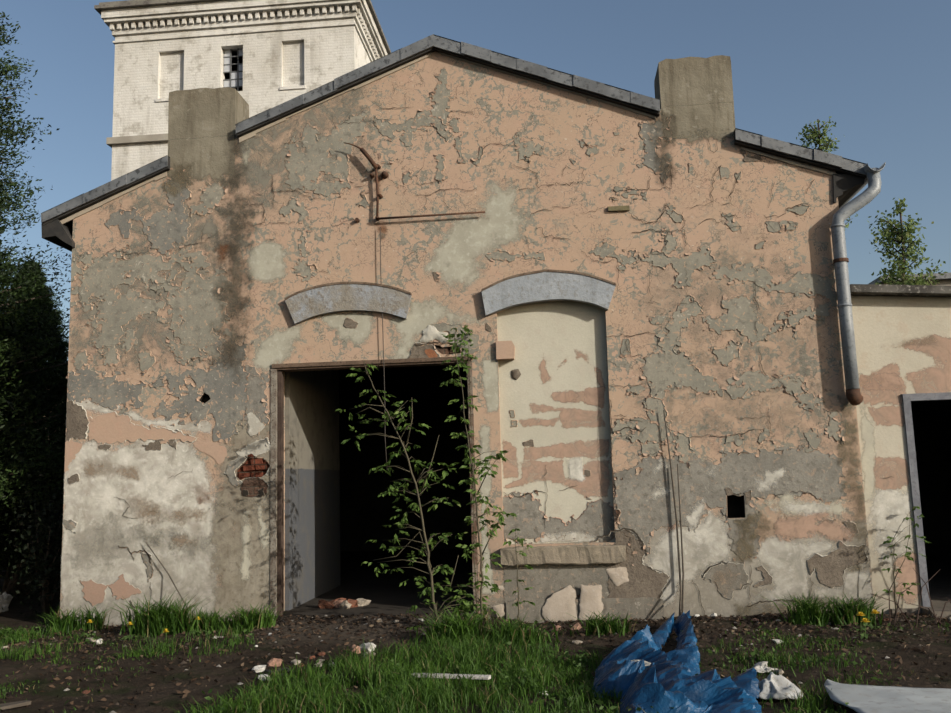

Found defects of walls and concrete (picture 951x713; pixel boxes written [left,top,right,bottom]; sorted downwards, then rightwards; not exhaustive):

damp [70,88,368,367]
crack [247,177,325,240]
peeling [246,68,486,283]
crack [354,165,477,211]
flaking render [424,183,545,287]
flaking render [635,102,734,184]
flaking render [61,135,302,626]
flaking render [392,299,518,428]
crack [595,332,729,614]
peeling [479,202,914,618]
crack [118,545,153,609]
crack [736,569,844,607]